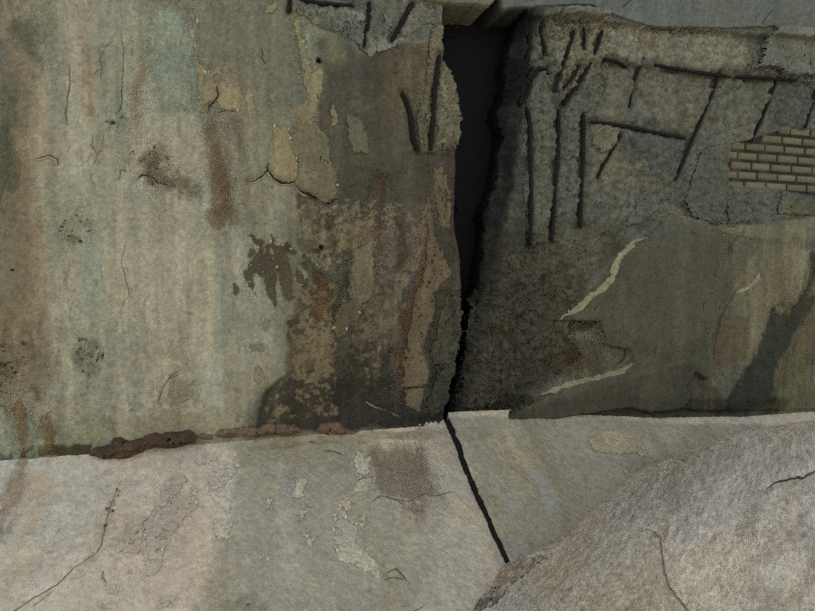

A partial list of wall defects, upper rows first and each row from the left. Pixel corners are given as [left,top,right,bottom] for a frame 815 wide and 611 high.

water stain [148,2,198,111]
spalling [271,0,463,203]
corrosion [206,129,232,228]
spalling [401,5,815,417]
peeling [231,233,304,307]
flaking render [333,244,377,340]
crack [448,300,478,412]
water stain [717,253,815,416]
water stain [0,406,45,459]
peeling [354,452,372,492]
crack [14,483,120,611]
peeling [331,497,384,582]